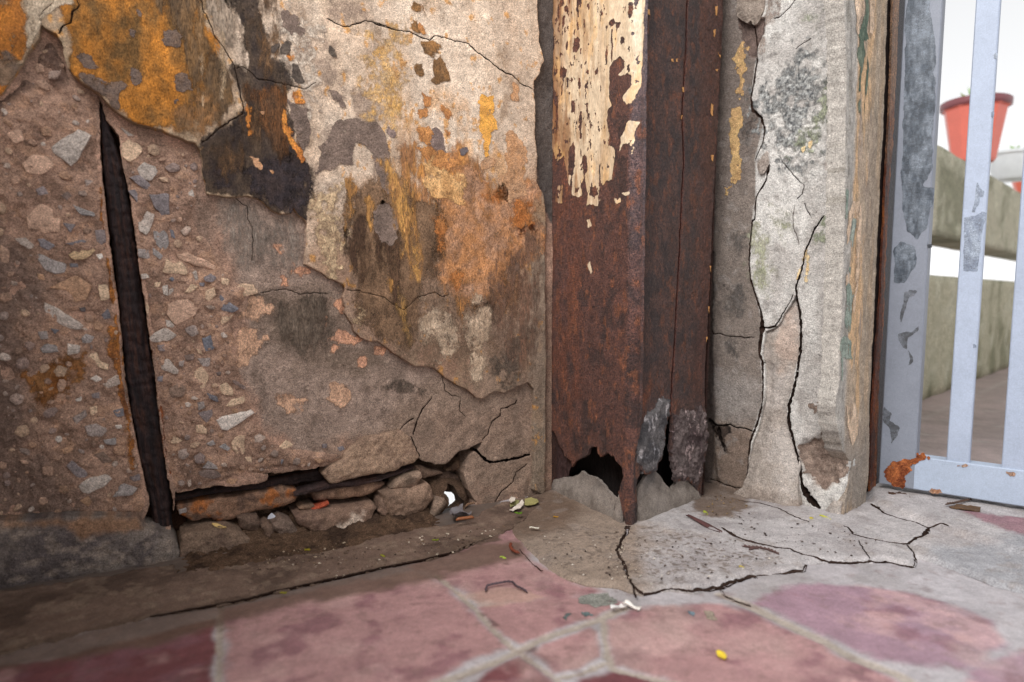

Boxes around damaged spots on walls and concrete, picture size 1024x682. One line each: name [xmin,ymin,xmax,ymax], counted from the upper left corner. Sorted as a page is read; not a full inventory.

corrosion [59,0,261,181]
flaking render [0,0,546,531]
corrosion [282,90,305,163]
water stain [200,0,546,390]
crack [327,18,532,89]
corrosion [380,93,546,319]
crack [709,0,824,522]
peeling [893,0,936,365]
crack [473,400,530,500]
crack [615,503,949,607]
spalling [797,432,849,489]
corrosion [884,453,930,489]